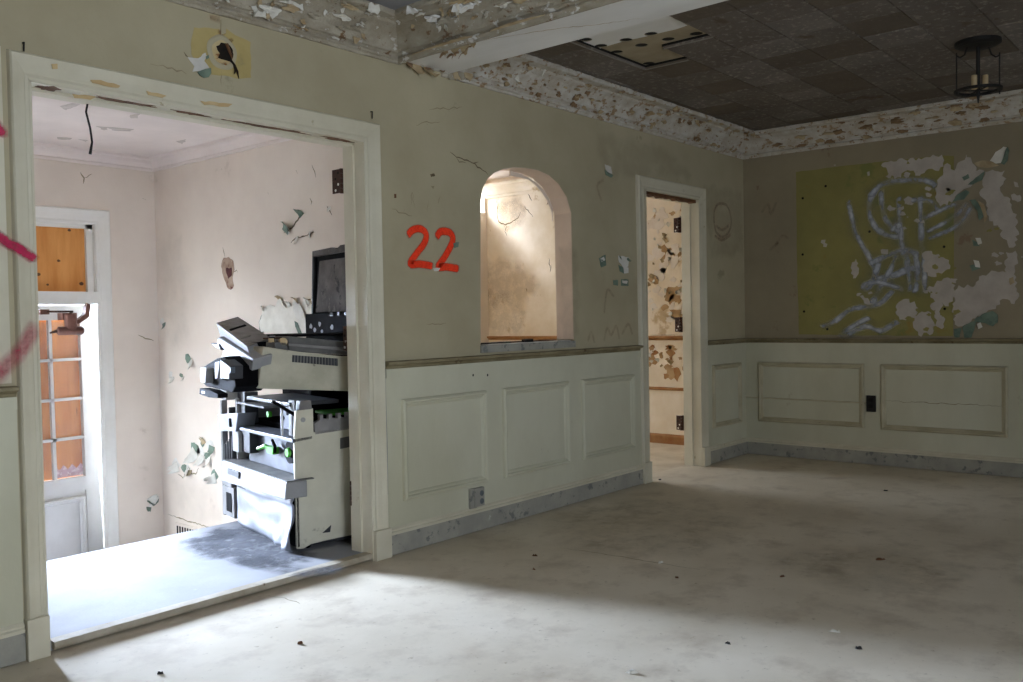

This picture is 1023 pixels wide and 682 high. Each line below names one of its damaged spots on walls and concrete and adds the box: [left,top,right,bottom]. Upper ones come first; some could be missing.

spalling [184,20,239,79]
peeling [250,0,380,44]
peeling [406,0,625,116]
peeling [488,14,714,70]
peeling [628,106,756,153]
peeling [772,121,882,148]
peeling [891,99,997,134]
spalling [221,250,237,290]
peeling [647,203,683,323]
peeling [867,147,1023,338]
peeling [649,345,683,381]